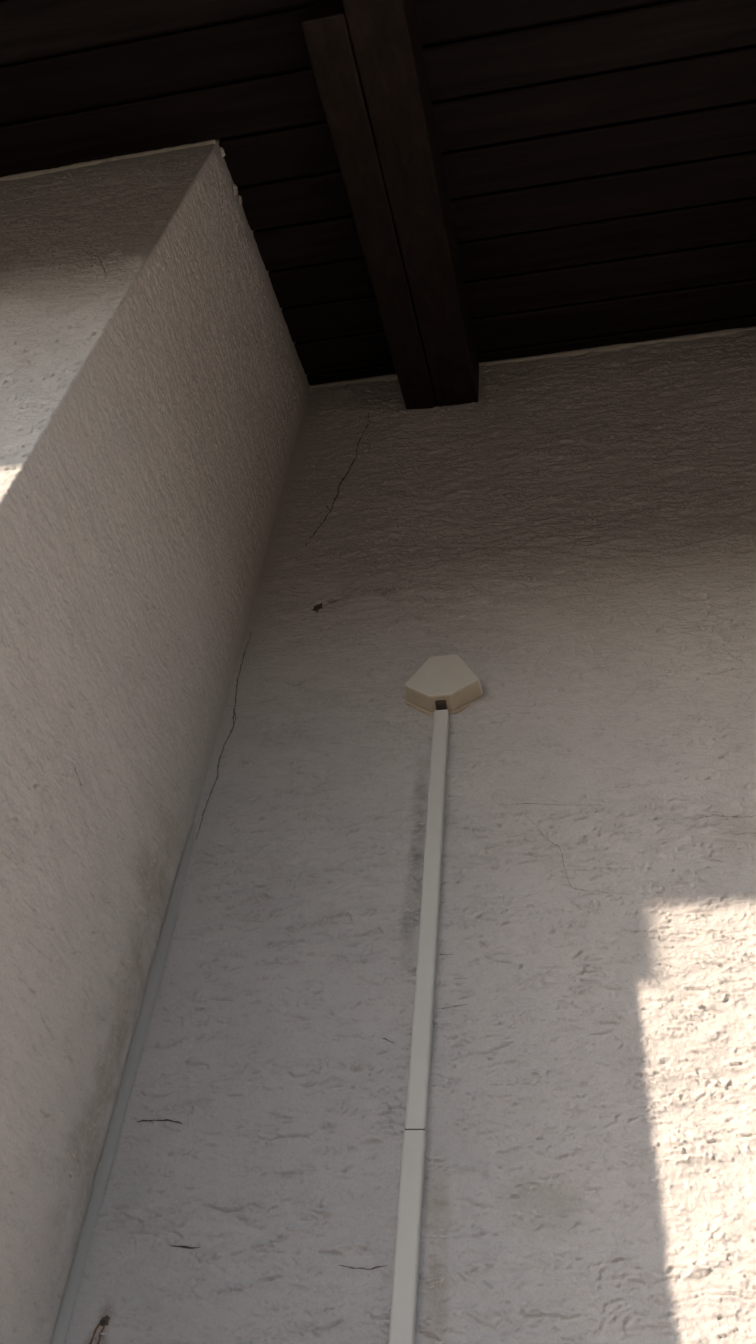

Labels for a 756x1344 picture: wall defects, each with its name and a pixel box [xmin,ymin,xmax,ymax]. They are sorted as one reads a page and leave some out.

crack [305,412,371,546]
crack [196,632,252,839]